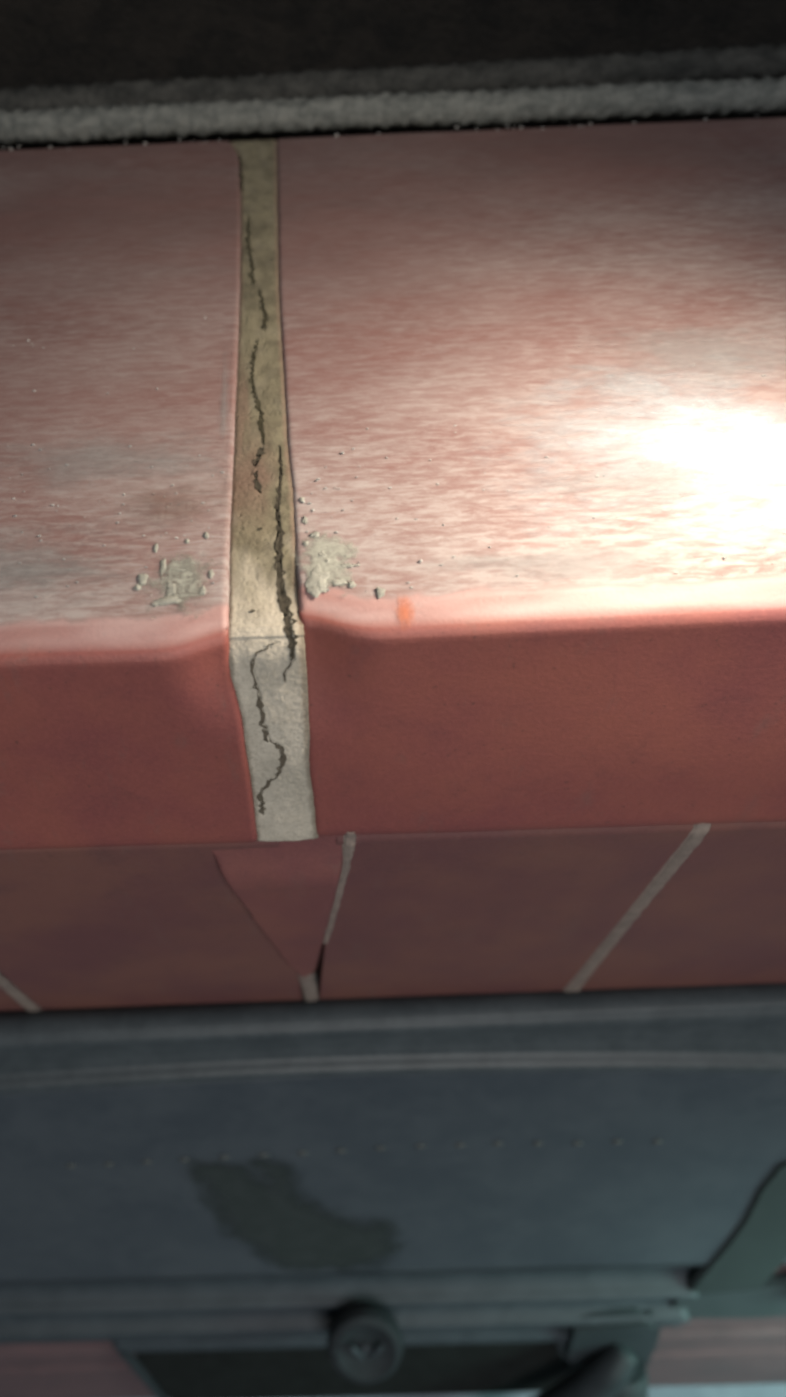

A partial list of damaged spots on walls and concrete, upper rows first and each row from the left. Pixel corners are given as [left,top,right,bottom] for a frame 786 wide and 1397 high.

crack [238,155,299,815]